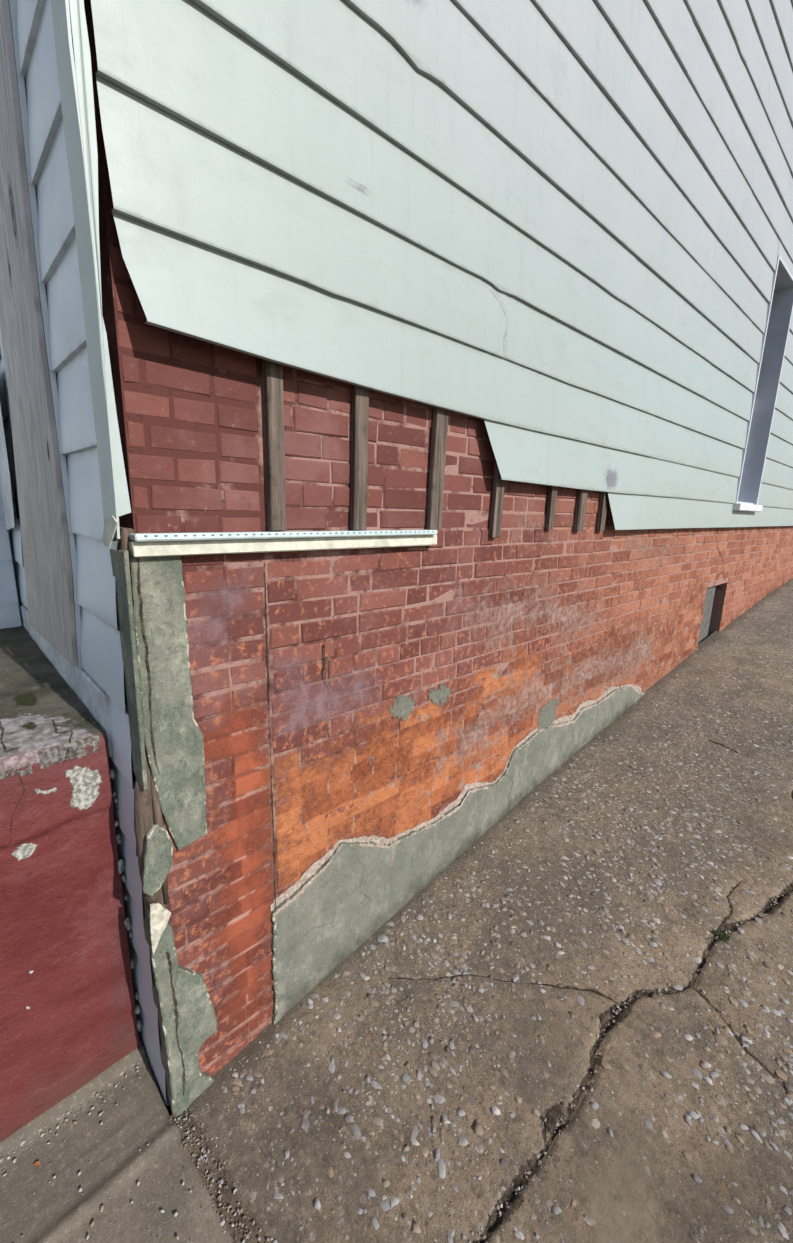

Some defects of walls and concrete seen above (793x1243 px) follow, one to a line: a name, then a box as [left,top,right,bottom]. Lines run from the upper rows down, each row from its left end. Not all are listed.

spalling [12,843,37,860]
peeling [0,713,102,810]
peeling [110,549,705,1116]
crack [389,880,793,1243]